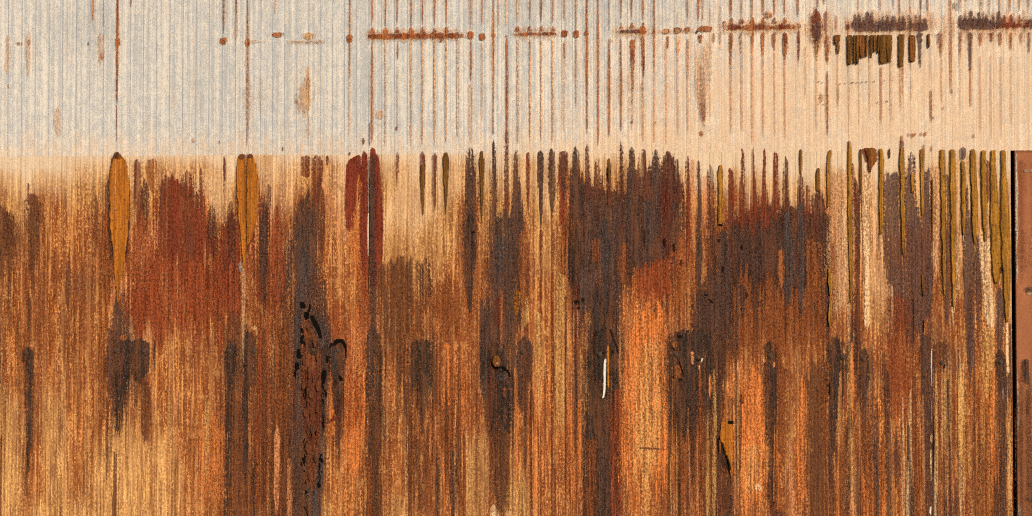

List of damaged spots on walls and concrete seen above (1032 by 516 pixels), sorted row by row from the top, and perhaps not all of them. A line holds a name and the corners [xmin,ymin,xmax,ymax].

rust [94,0,331,516]
rust [325,0,1032,516]